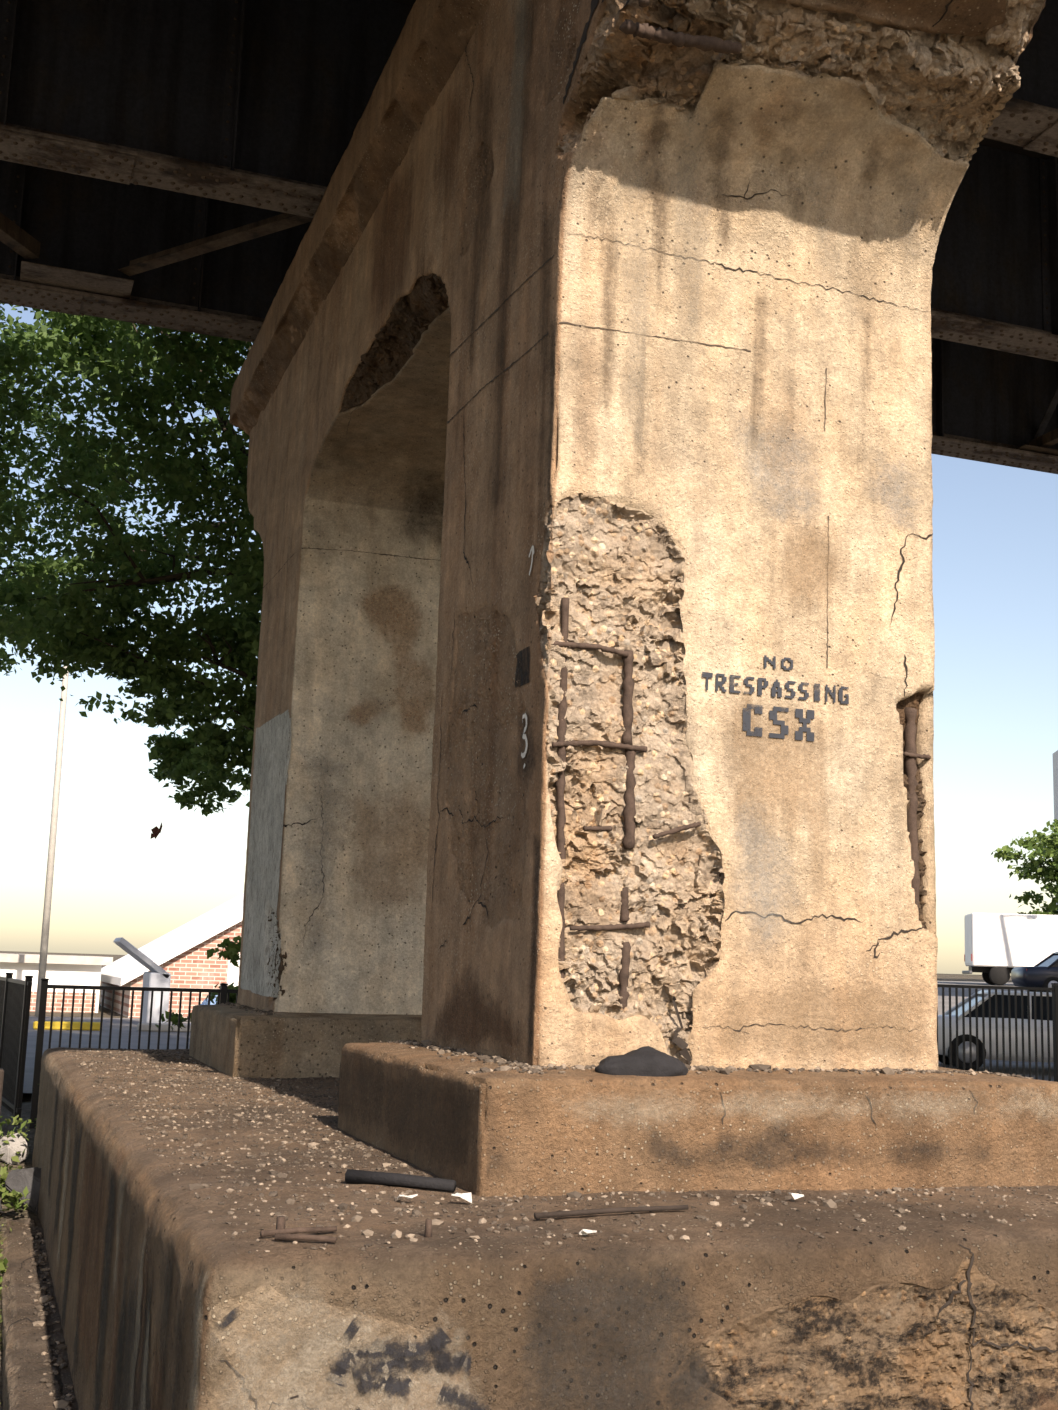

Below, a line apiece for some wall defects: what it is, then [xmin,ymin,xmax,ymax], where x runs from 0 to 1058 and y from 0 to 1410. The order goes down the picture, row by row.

spalling [554,0,1044,162]
spalling [339,273,449,413]
spalling [446,605,528,930]
spalling [533,493,725,1065]
spalling [896,691,931,930]
crack [725,911,925,958]
water stain [48,1094,196,1410]
water stain [524,1263,713,1410]
spalling [689,1258,1058,1410]